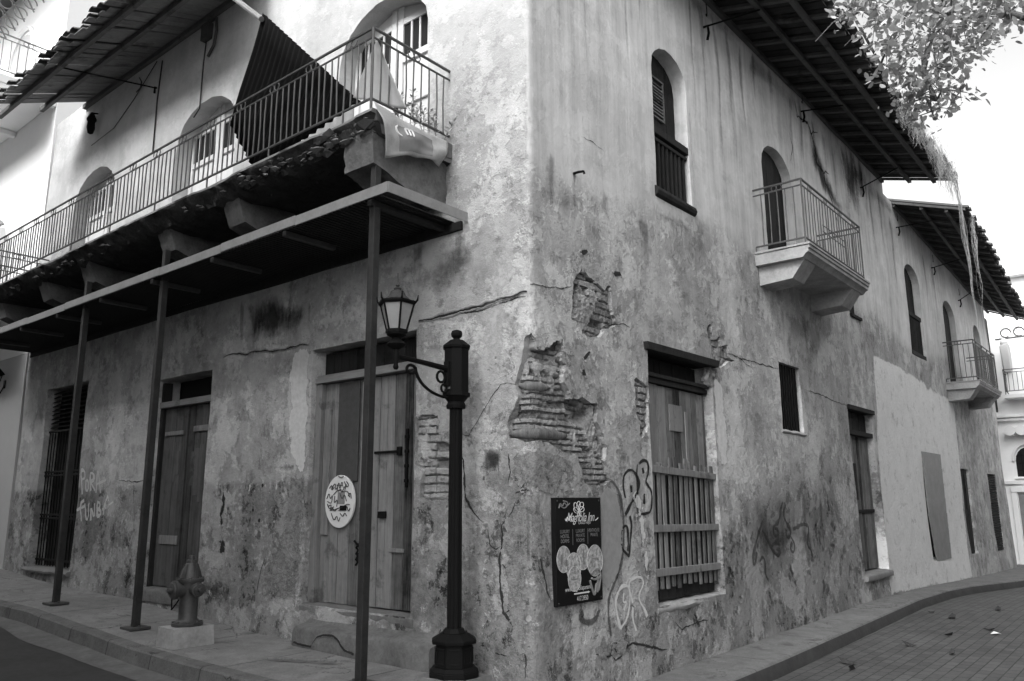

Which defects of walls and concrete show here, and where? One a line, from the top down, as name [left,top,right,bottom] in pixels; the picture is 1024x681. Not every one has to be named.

water stain [813,146,835,202]
water stain [253,302,301,336]
crack [418,284,573,322]
spalling [571,249,618,337]
crack [224,343,308,357]
spalling [634,380,650,437]
spalling [414,415,449,500]
spalling [499,337,606,655]
crack [462,383,551,677]